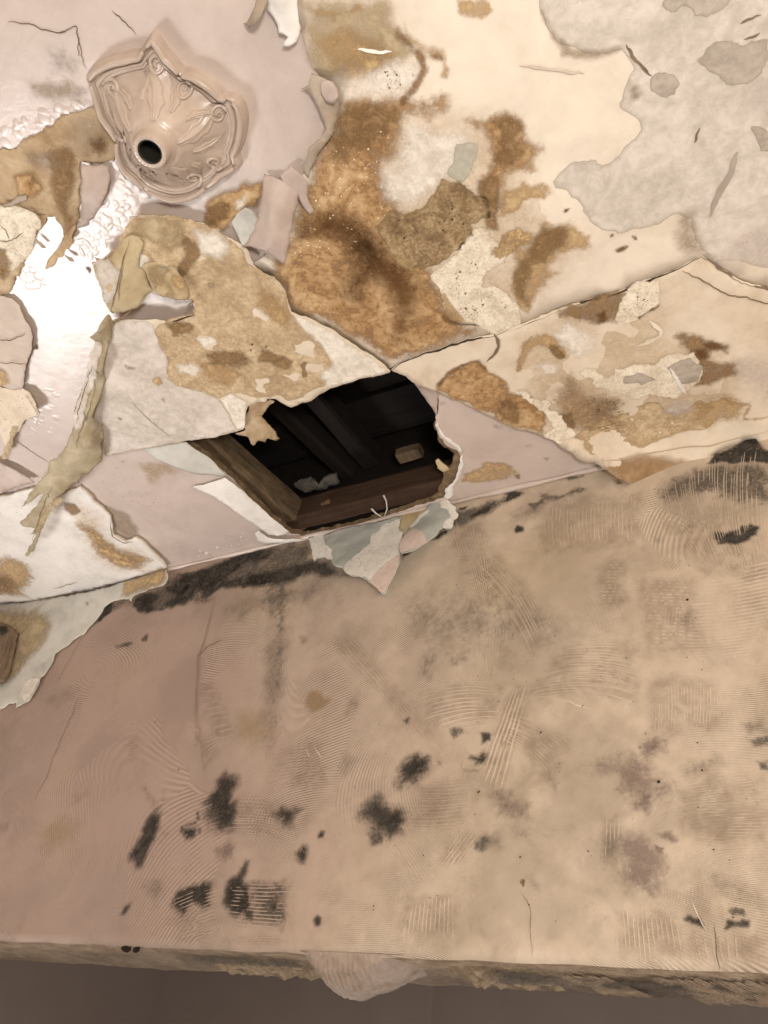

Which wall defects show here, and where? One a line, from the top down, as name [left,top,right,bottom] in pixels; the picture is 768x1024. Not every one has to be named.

crack [8,21,85,66]
peeling [539,0,768,267]
water stain [93,96,547,401]
water stain [509,223,588,312]
crack [392,256,768,370]
peeling [0,234,464,595]
water stain [437,334,768,501]
water stain [98,543,337,621]
water stain [434,476,583,539]
water stain [714,525,759,555]
water stain [130,814,159,867]
water stain [224,862,285,922]